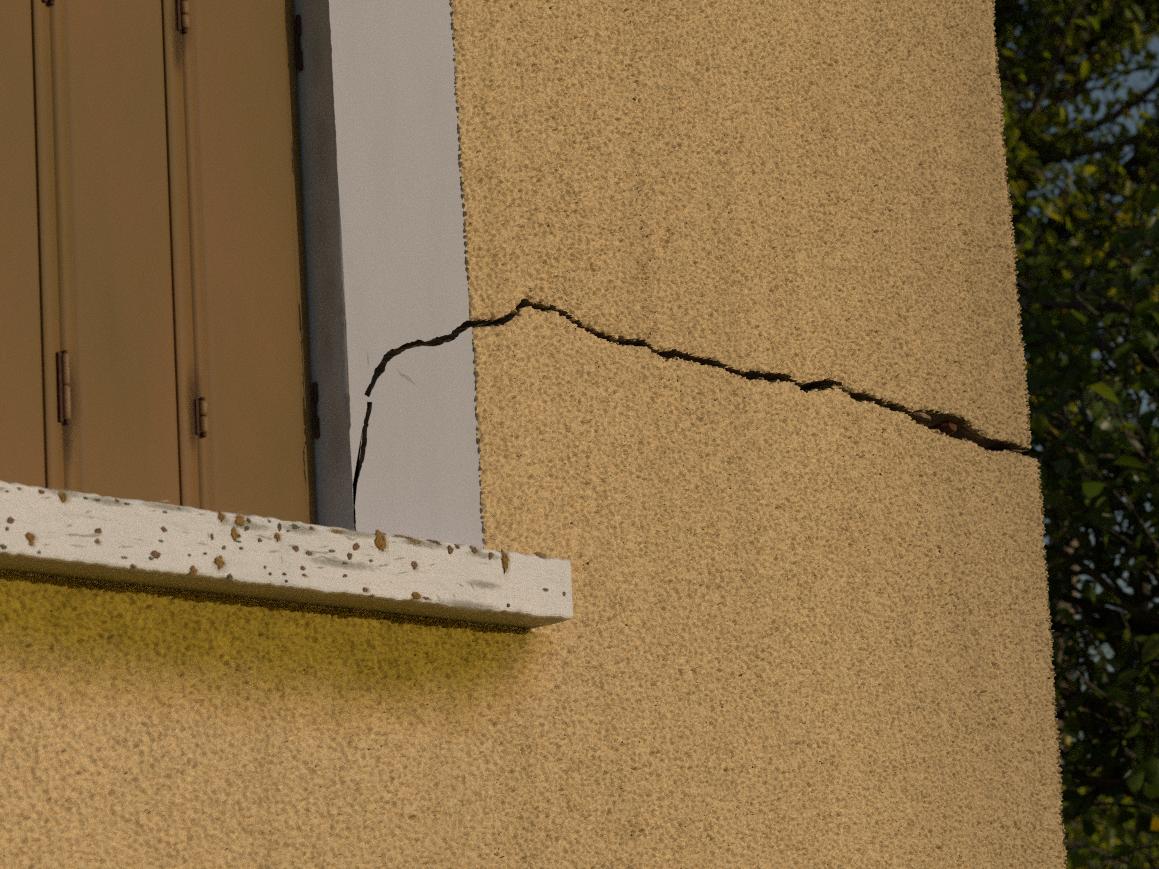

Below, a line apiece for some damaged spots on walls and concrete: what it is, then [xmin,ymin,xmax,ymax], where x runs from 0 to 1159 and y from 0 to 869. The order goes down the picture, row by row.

crack [342,283,1036,528]